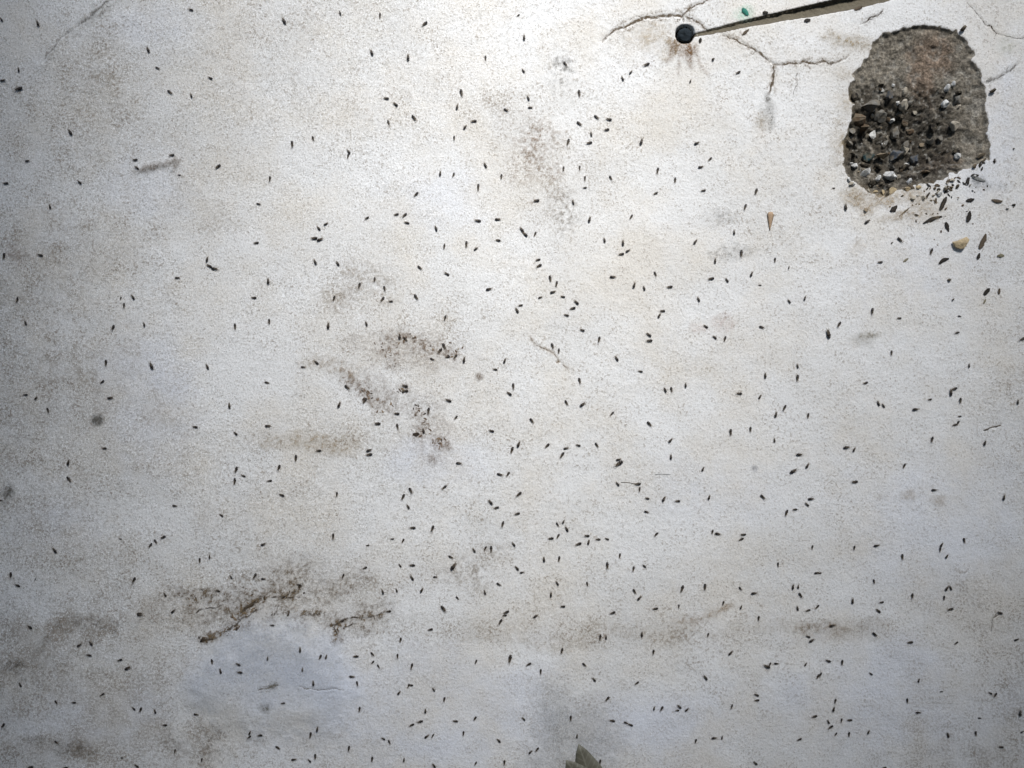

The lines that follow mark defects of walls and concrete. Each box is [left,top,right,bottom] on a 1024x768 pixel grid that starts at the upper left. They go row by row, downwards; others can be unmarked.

crack [609,0,841,94]
spalling [842,25,991,207]